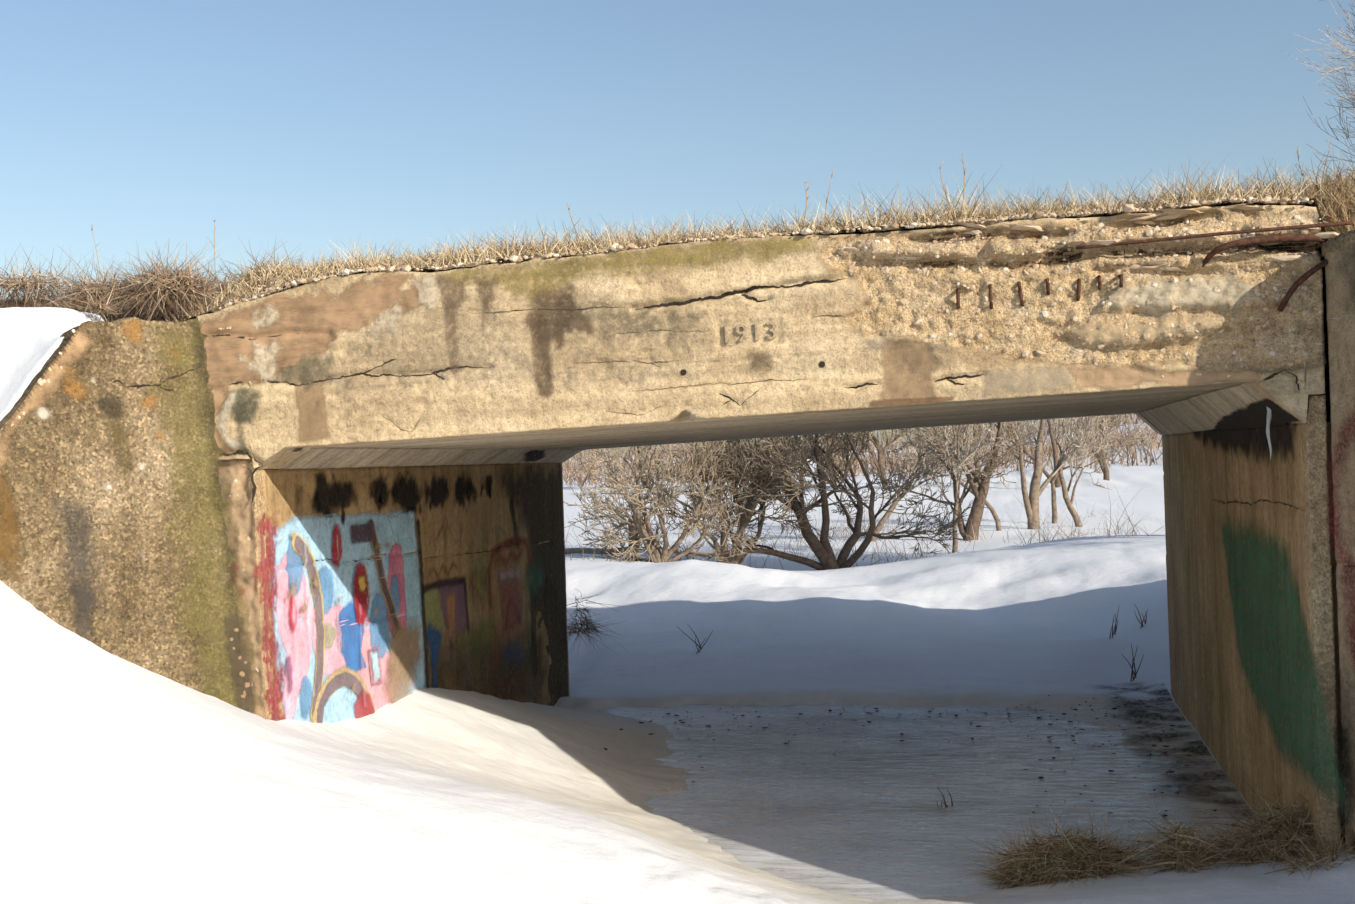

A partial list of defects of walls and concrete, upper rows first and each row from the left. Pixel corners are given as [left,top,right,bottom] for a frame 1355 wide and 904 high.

crack [212,332,308,340]
crack [114,359,491,391]
water stain [527,285,592,396]
crack [478,278,857,416]
spalling [820,203,1339,406]